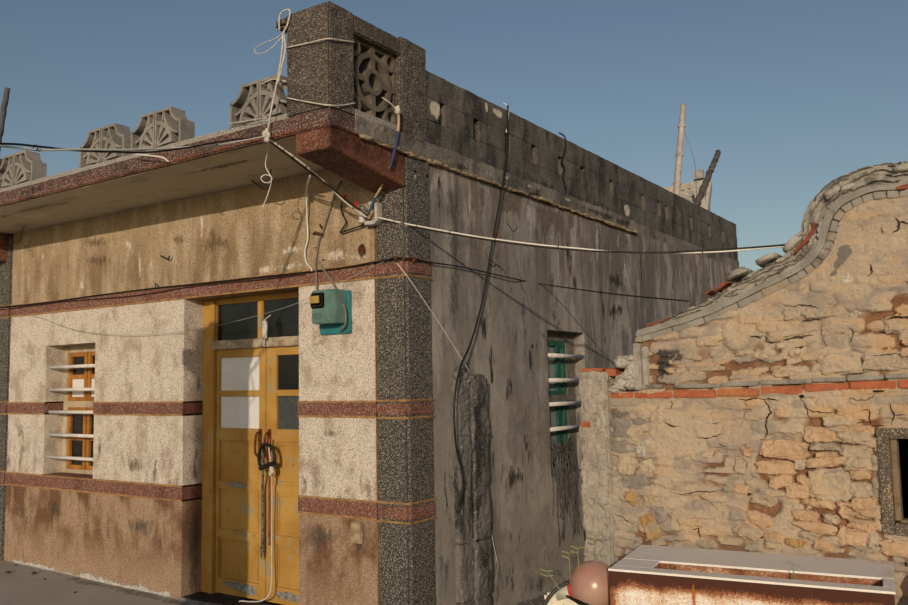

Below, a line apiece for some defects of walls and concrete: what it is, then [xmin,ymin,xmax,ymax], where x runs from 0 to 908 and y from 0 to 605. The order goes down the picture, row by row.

damp [514,171,646,286]
damp [481,319,493,383]
crack [751,304,837,351]
crack [844,316,908,375]
crack [741,394,904,440]
damp [508,466,524,489]
spalling [610,404,667,541]
spalling [732,414,908,566]